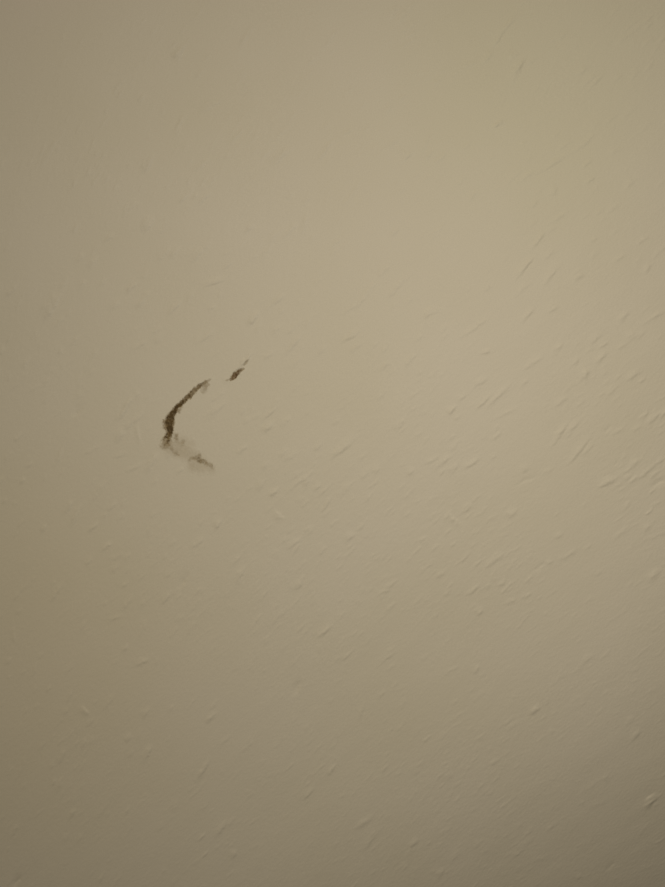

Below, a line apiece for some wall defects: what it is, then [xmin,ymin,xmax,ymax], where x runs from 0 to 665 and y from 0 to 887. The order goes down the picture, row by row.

crack [156,354,253,476]